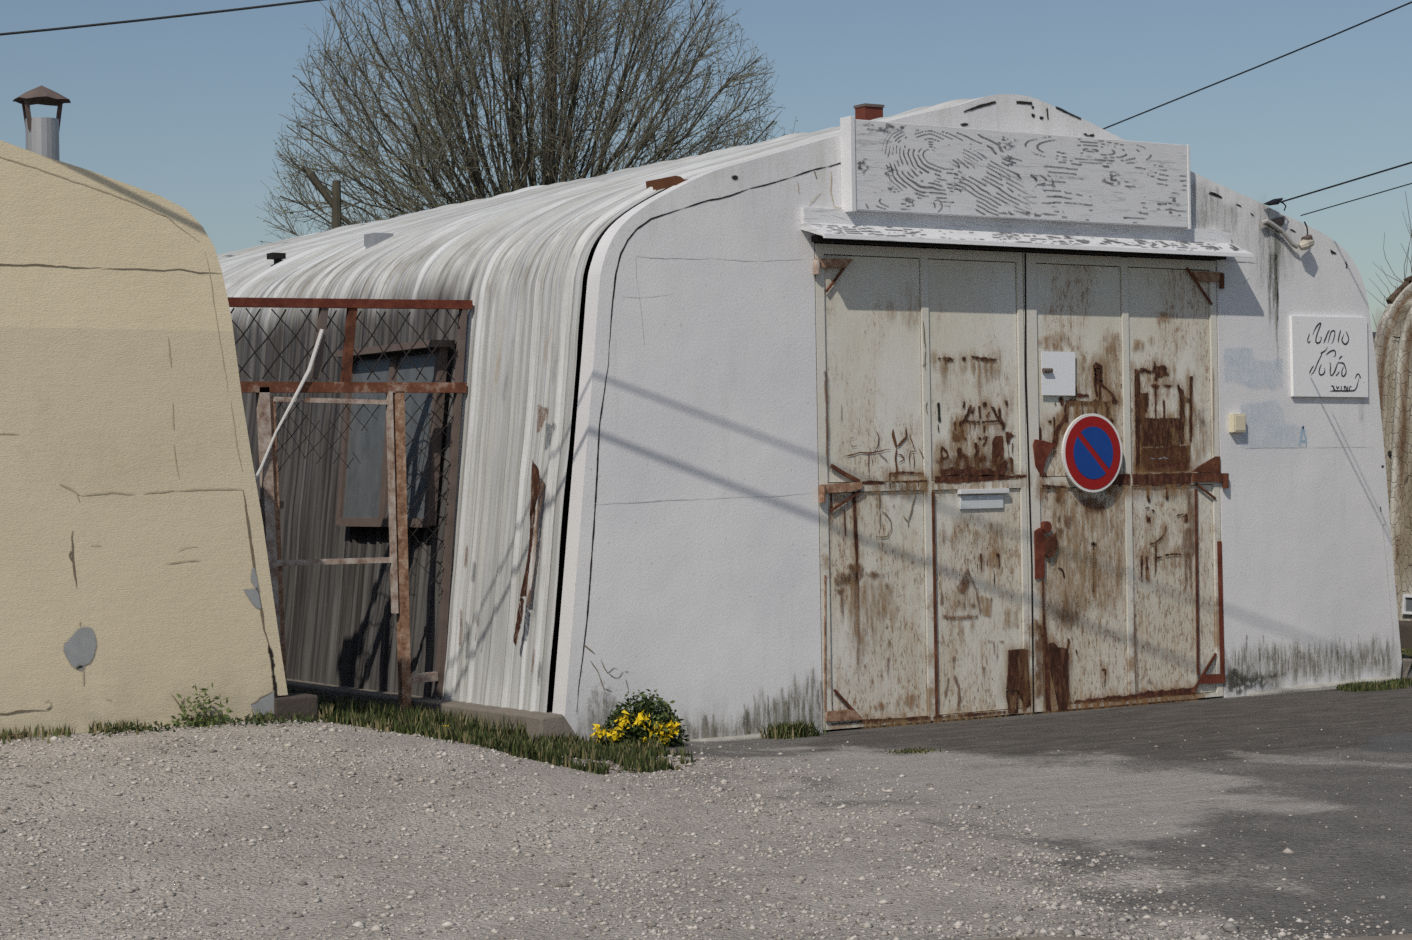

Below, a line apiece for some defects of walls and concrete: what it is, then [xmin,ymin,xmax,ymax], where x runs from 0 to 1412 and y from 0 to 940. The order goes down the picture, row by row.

peeling [866,101,1239,250]
peeling [827,223,975,239]
leakage [1268,229,1280,328]
crack [0,156,269,645]
corrosion [933,355,999,374]
corrosion [1039,339,1118,448]
corrosion [828,361,1214,728]
spalling [63,627,96,670]
leakage [1228,635,1390,693]